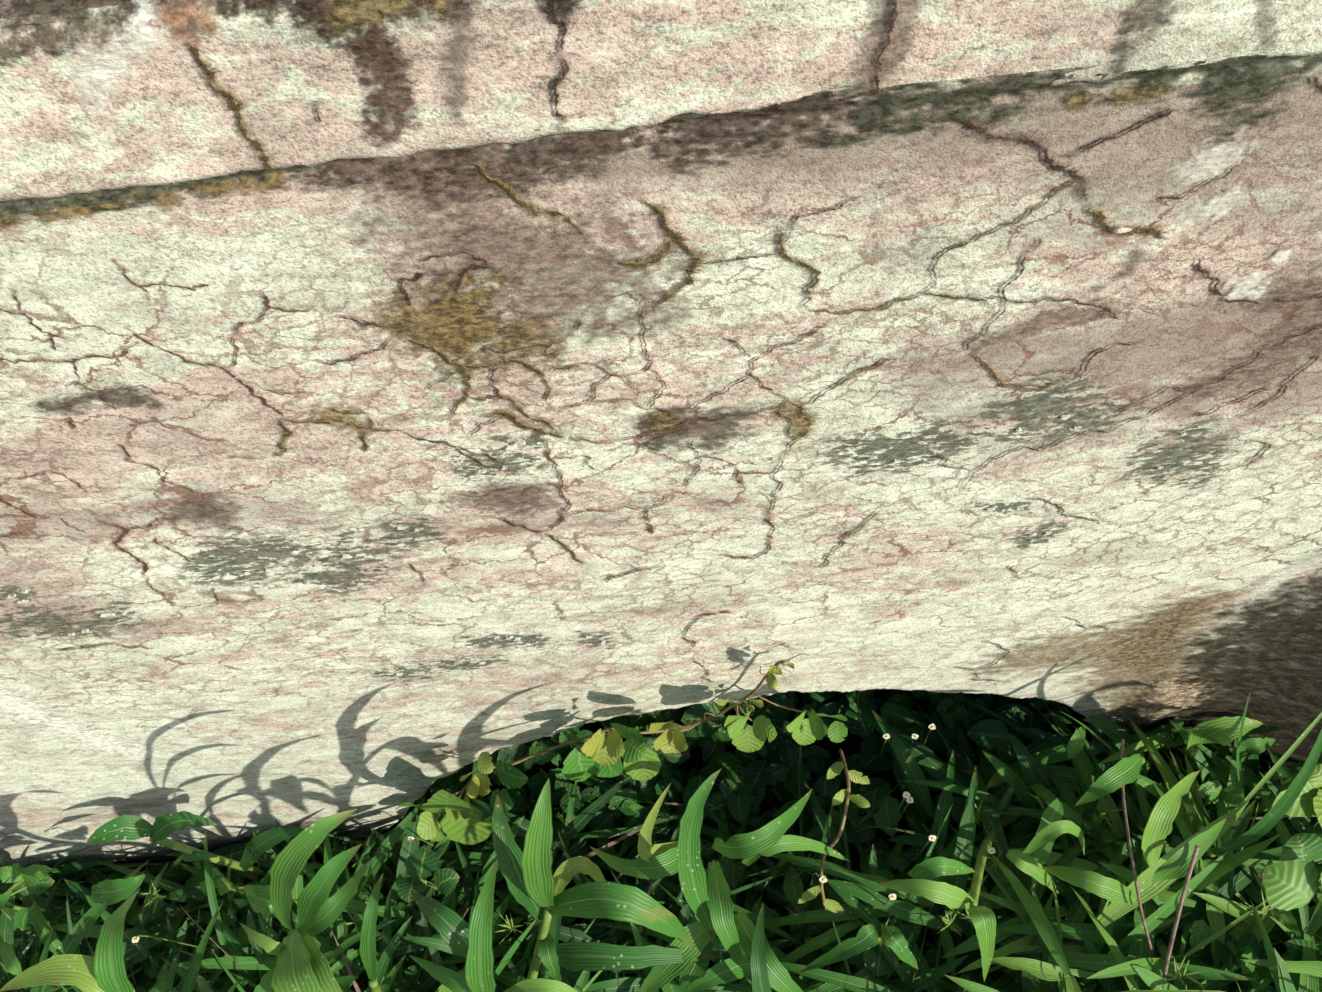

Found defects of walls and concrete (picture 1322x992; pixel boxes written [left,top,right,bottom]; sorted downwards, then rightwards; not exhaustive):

crack [548,2,570,129]
crack [186,42,273,171]
water stain [216,0,920,337]
crack [0,109,1243,597]
crack [935,259,1322,488]
water stain [637,408,755,451]
crack [209,589,267,607]
water stain [1256,558,1322,591]
crack [56,643,154,651]
crack [684,612,732,682]
crack [952,642,1009,682]